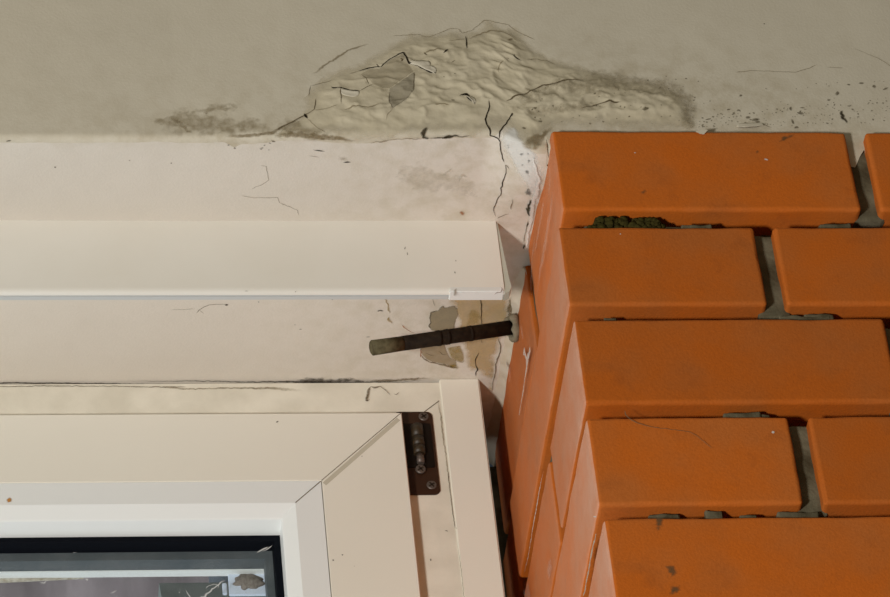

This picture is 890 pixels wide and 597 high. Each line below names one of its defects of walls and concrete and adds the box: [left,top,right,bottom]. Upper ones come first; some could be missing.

flaking render [362,55,415,107]
leakage [239,126,343,140]
crack [461,79,578,219]
leakage [503,101,546,250]
flaking render [429,306,458,331]
flaking render [421,345,464,368]